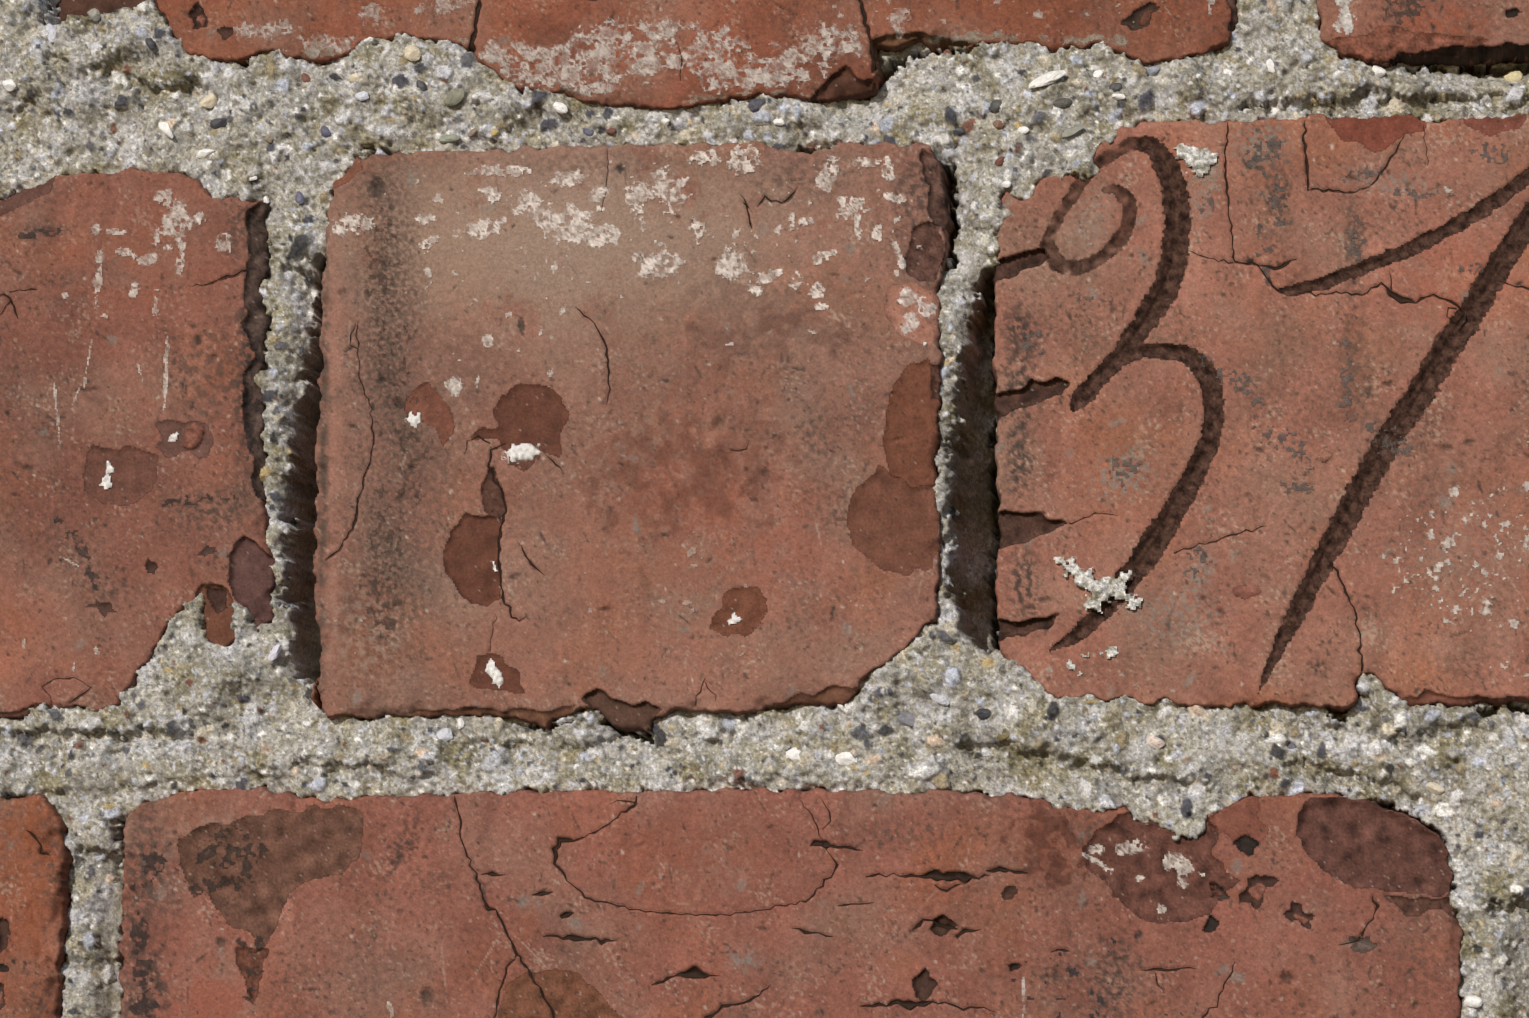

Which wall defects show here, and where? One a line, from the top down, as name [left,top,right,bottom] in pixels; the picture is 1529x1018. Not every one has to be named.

damp [460,5,862,104]
damp [332,212,374,235]
damp [415,144,937,335]
crack [1188,121,1466,326]
damp [444,359,480,397]
spalling [847,148,955,576]
spalling [403,382,570,606]
spalling [195,536,276,647]
crack [454,796,554,1018]
crack [552,796,838,916]
spalling [1296,796,1458,920]
crack [1202,962,1235,1018]